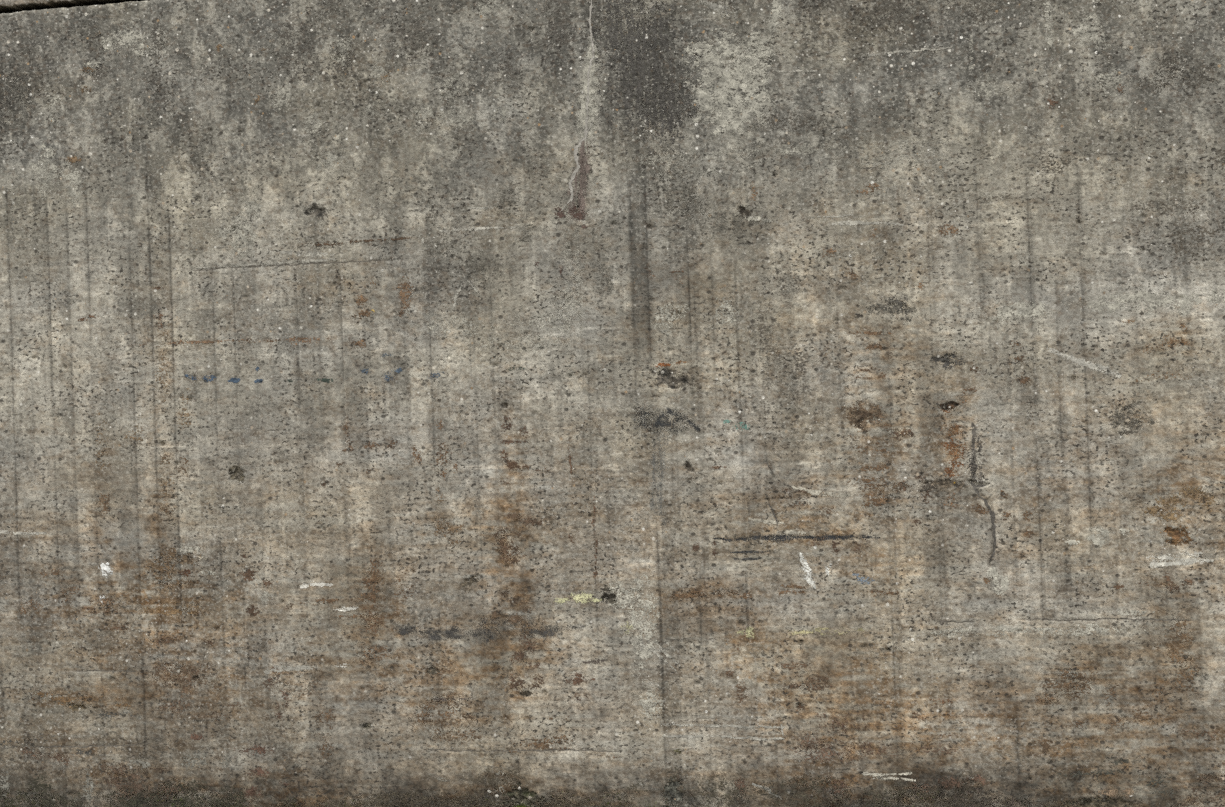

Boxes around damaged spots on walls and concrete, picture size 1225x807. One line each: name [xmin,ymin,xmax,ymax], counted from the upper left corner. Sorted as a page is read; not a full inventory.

water stain [148,16,177,111]
water stain [269,0,358,89]
water stain [425,202,503,289]
rust [554,206,588,229]
crack [560,0,595,212]
water stain [535,0,773,381]
water stain [756,110,838,134]
water stain [794,0,929,53]
water stain [1037,153,1076,177]
water stain [1128,198,1225,260]
water stain [1139,47,1220,96]
crack [971,447,996,565]